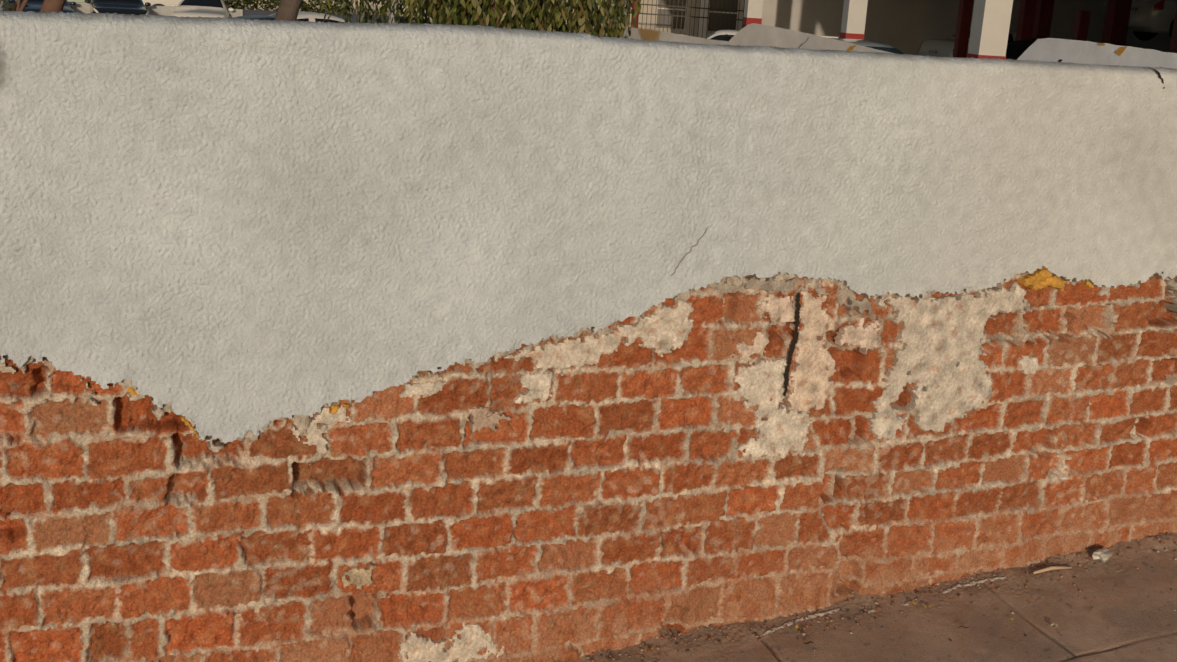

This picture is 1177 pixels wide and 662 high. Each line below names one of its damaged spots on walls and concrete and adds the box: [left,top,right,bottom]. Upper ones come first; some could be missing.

spalling [0,267,1177,662]